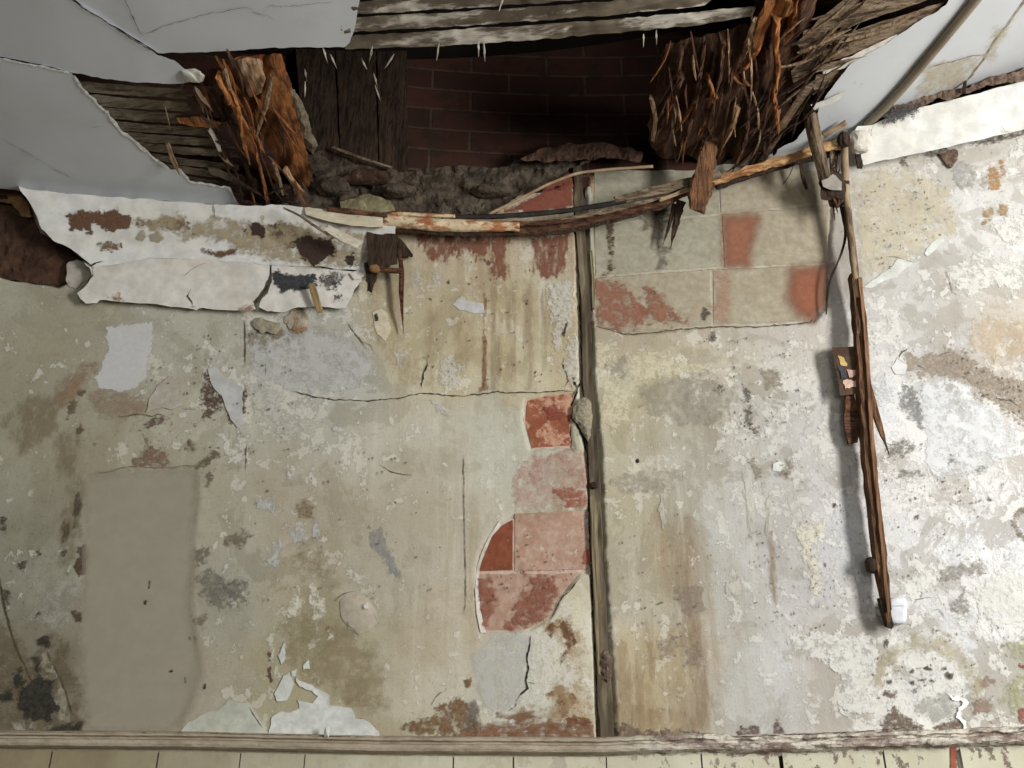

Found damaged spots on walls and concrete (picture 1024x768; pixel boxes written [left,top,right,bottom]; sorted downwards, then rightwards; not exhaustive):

crack [72,0,332,53]
flaking render [893,68,1024,111]
flaking render [924,148,958,168]
flaking render [973,131,1024,145]
flaking render [0,203,83,285]
peeling [94,320,154,393]
crack [295,277,822,688]
flaking render [29,471,380,737]
flaking render [477,486,590,708]
damp [0,636,84,731]
crack [509,636,536,711]
rust [460,621,594,737]